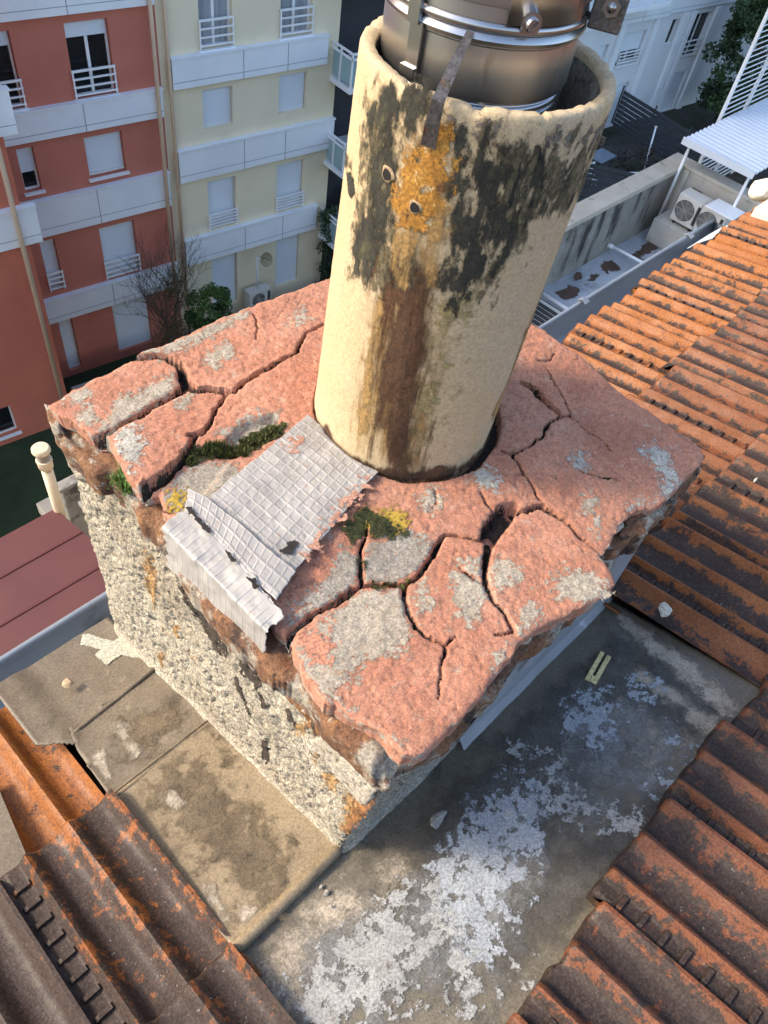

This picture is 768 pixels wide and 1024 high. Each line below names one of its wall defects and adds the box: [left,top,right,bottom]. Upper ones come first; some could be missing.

rust [390,120,462,290]
peeling [61,309,251,477]
peeling [156,460,242,514]
crack [95,329,317,504]
water stain [297,70,654,563]
crack [462,355,589,637]
spalling [177,583,227,661]
crack [234,659,318,736]
crack [286,535,453,699]
water stain [554,613,743,825]
water stain [144,725,299,923]
water stain [257,789,550,1024]